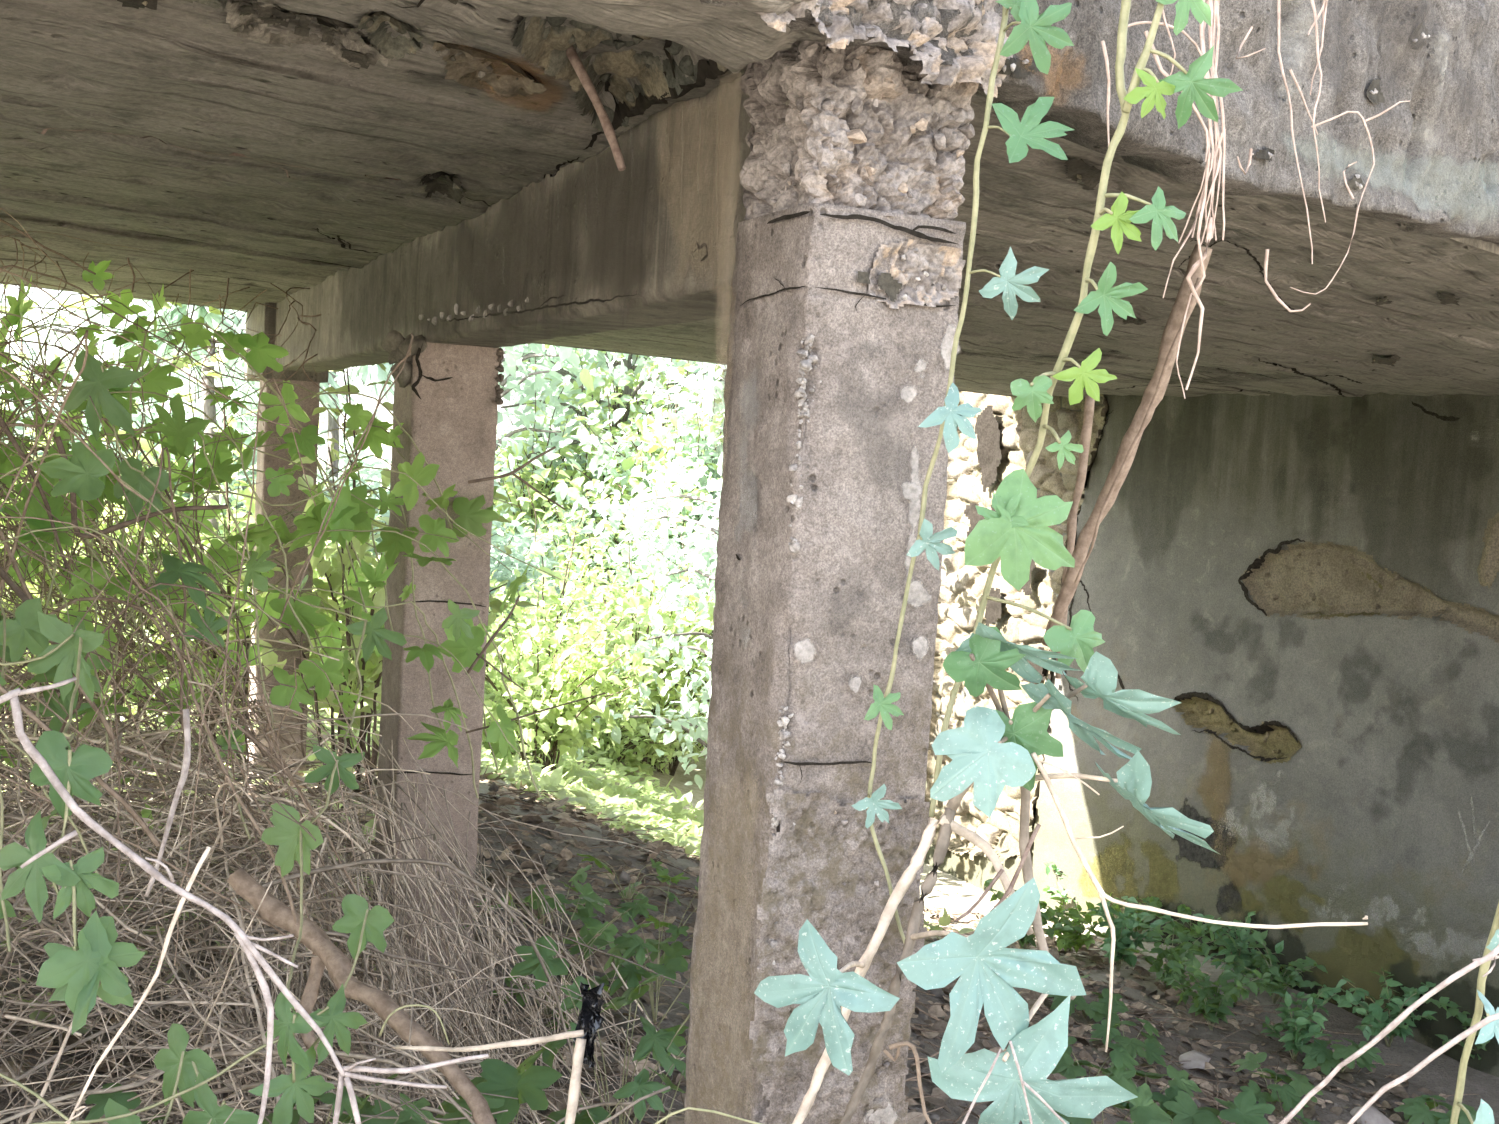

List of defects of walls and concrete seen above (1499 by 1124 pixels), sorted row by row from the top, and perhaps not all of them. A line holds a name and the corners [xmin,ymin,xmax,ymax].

spalling [117,0,158,10]
spalling [183,0,728,171]
spalling [754,0,1040,98]
crack [767,211,957,244]
crack [740,278,889,311]
peeling [1477,512,1499,588]
spalling [1238,538,1499,643]
spalling [1172,692,1302,764]
damp [1172,798,1244,914]